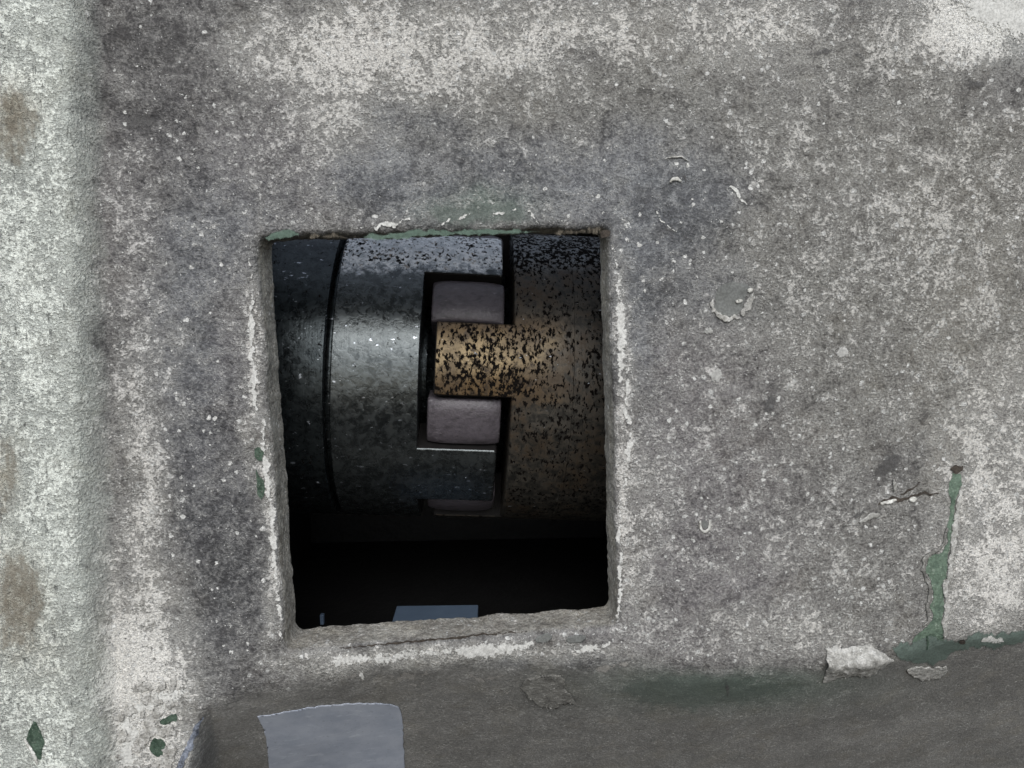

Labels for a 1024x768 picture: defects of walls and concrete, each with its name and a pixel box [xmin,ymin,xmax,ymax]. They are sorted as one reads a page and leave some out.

peeling [710,281,755,322]
crack [855,479,939,523]
peeling [823,465,1024,683]